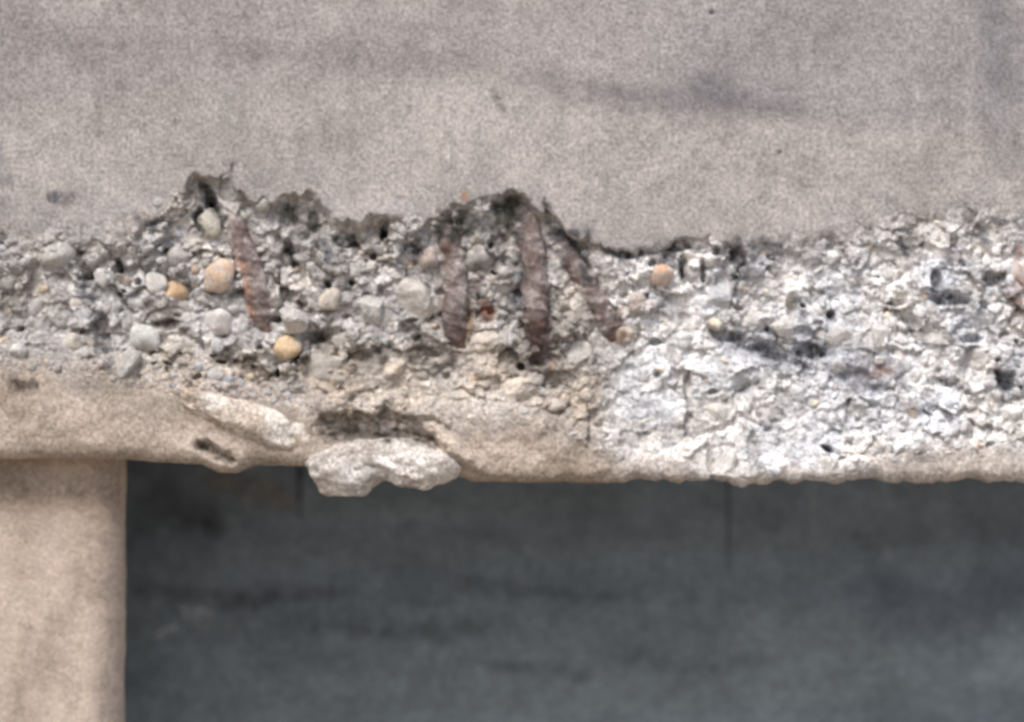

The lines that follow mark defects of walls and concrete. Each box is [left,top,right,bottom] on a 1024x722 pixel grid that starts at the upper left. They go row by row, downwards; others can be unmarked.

corrosion [221,212,276,333]
spalling [0,173,615,453]
corrosion [439,223,493,360]
corrosion [514,203,626,365]